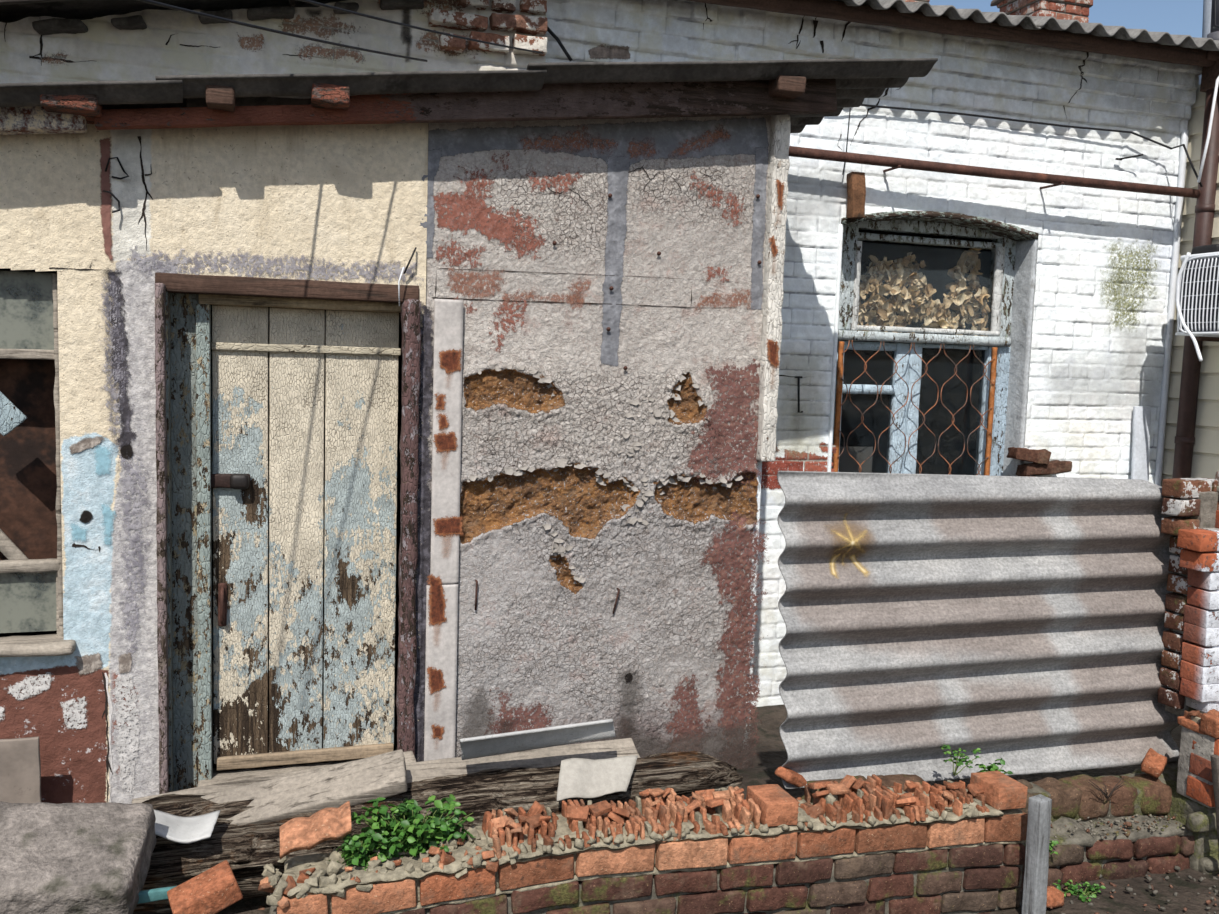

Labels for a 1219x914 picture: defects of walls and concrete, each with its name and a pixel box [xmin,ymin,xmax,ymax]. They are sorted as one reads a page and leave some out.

crack [1063,51,1089,118]
crack [137,136,153,244]
peeling [689,170,745,227]
peeling [433,126,731,351]
peeling [695,263,751,311]
peeling [69,436,133,475]
peeling [71,505,115,545]
peeling [459,358,837,768]
flaking render [1158,478,1219,739]